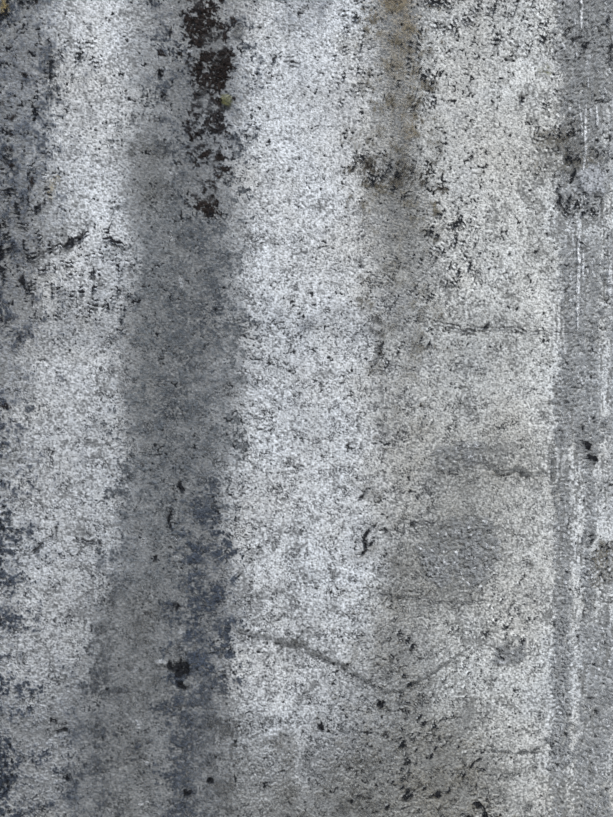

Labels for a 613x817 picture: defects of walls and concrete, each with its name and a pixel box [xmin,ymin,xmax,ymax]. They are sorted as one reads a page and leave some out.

water stain [0,0,73,351]
water stain [343,94,448,253]
crack [433,320,573,334]
water stain [0,388,40,458]
water stain [54,0,271,817]
water stain [0,446,61,638]
water stain [0,671,43,720]
water stain [0,731,51,817]
water stain [255,732,302,815]